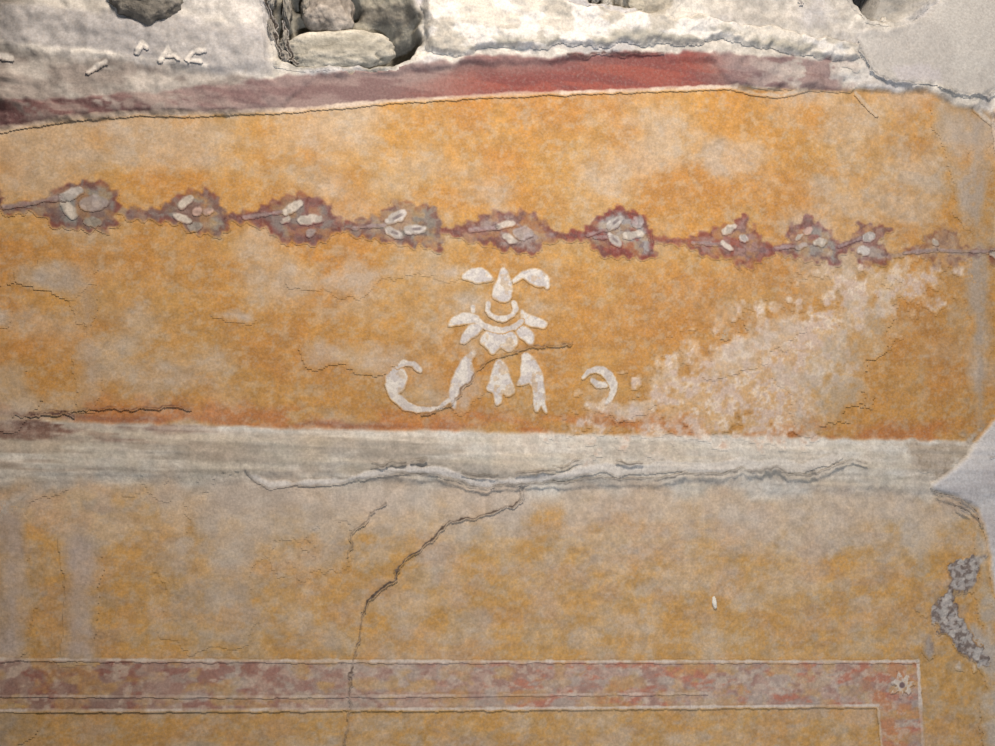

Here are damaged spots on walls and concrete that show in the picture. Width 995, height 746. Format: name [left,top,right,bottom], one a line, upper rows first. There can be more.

crack [264,0,299,66]
spalling [903,422,987,480]
crack [343,457,868,746]
spalling [915,554,992,673]